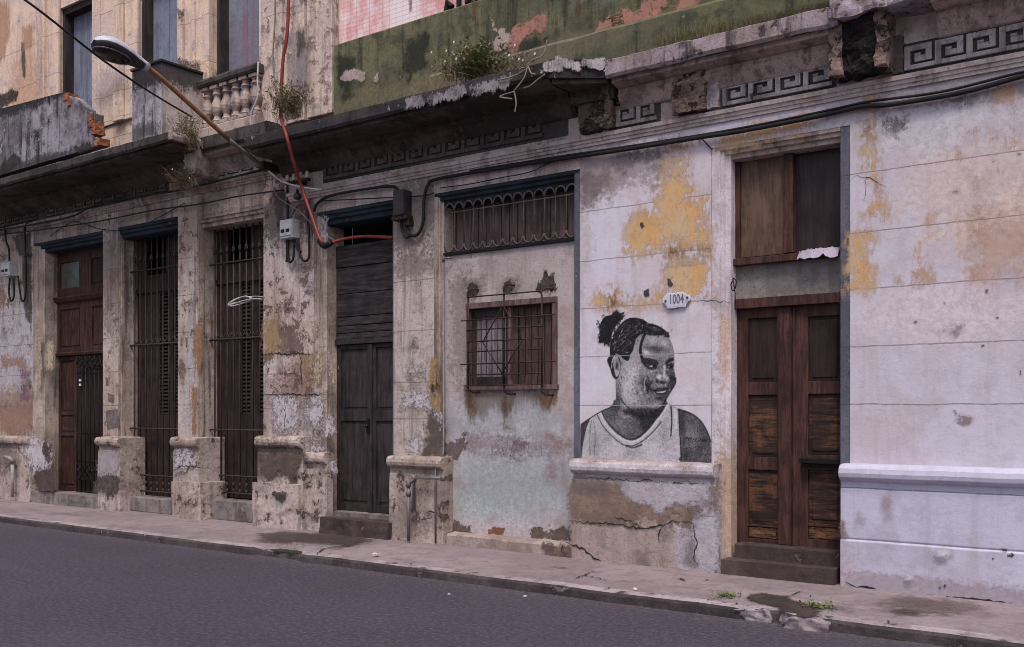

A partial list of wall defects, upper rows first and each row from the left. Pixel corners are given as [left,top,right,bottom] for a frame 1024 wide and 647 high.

peeling [490,13,548,54]
peeling [595,0,700,31]
spalling [88,113,110,149]
peeling [319,214,331,243]
peeling [595,136,713,313]
spalling [536,270,557,293]
peeling [0,335,56,496]
peeling [258,296,339,503]
rust [466,394,477,421]
crack [585,476,707,484]
crack [561,517,698,565]